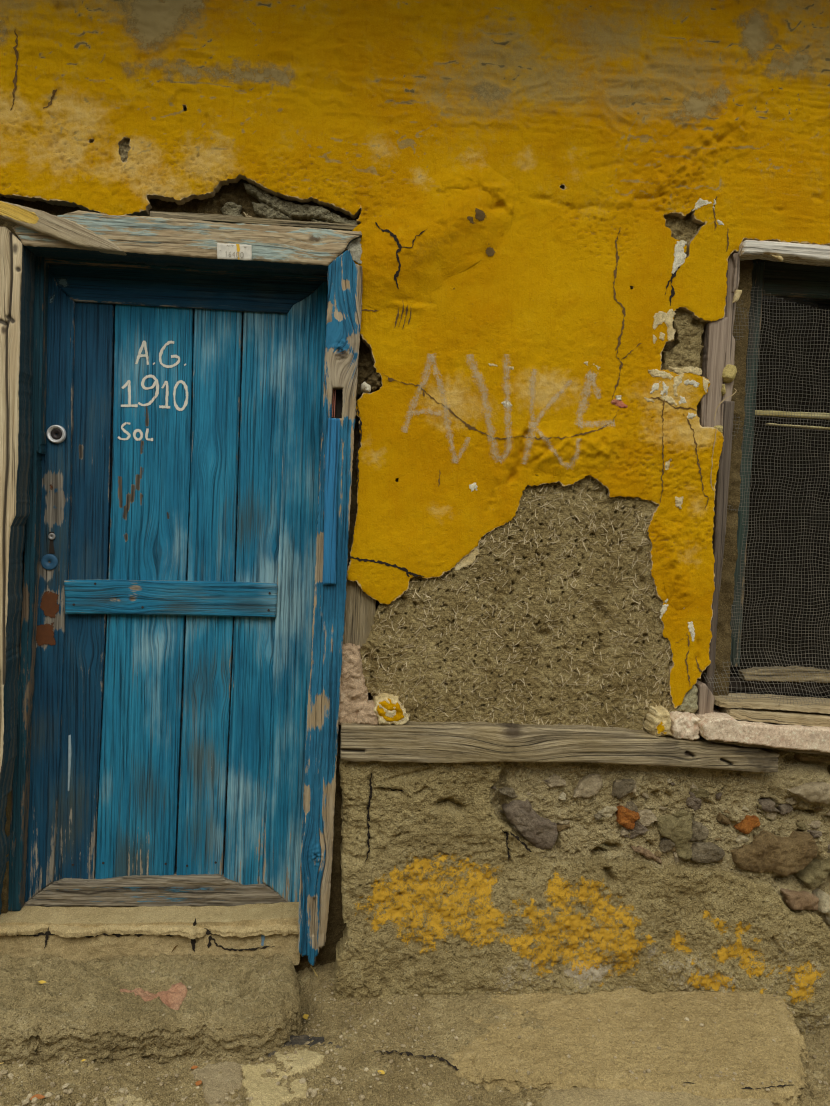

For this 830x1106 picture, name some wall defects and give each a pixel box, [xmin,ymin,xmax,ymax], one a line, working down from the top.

spalling [147,182,361,225]
peeling [346,238,362,264]
crack [375,222,427,289]
spalling [664,198,724,274]
crack [383,227,641,440]
spalling [644,308,710,419]
spalling [360,474,688,731]
spalling [490,748,830,929]